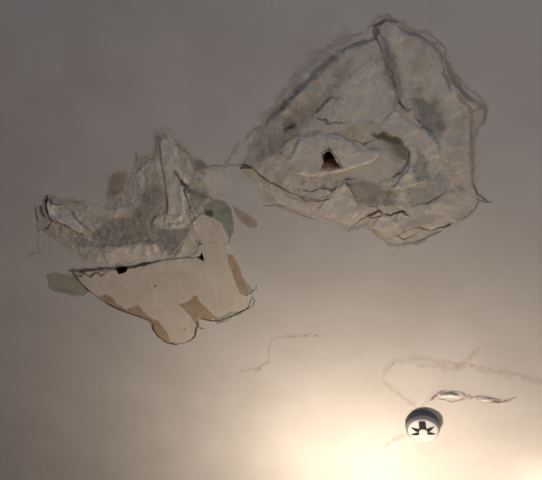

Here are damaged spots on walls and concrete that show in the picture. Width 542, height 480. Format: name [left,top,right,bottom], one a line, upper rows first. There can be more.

flaking render [318,148,343,171]
peeling [46,200,252,344]